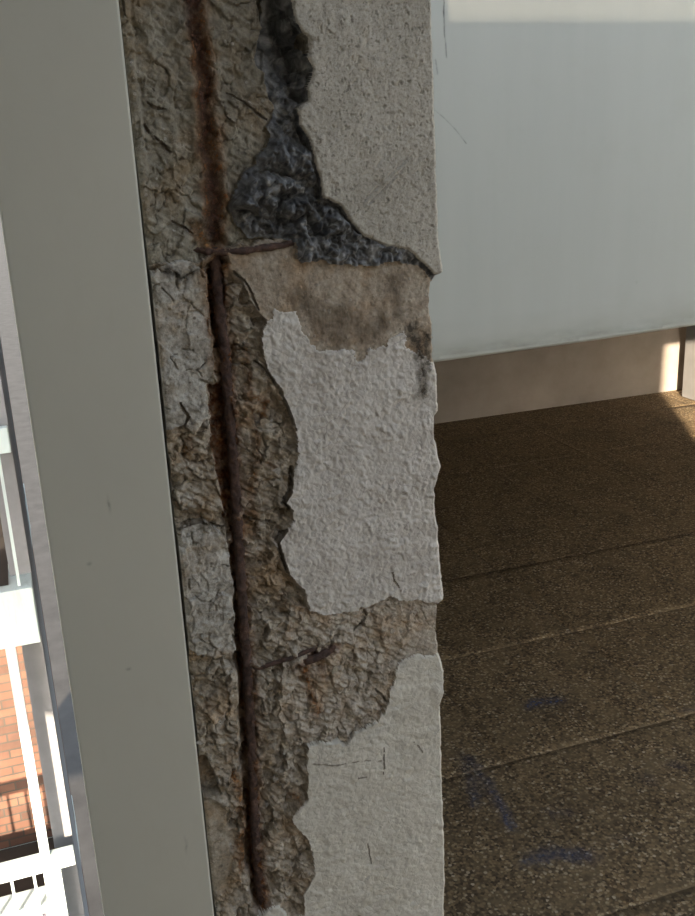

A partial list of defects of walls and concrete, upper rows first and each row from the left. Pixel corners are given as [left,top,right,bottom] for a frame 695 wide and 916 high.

crack [143,101,172,154]
corrosion [185,0,229,242]
crack [225,92,267,121]
crack [170,220,194,235]
spalling [118,0,438,916]